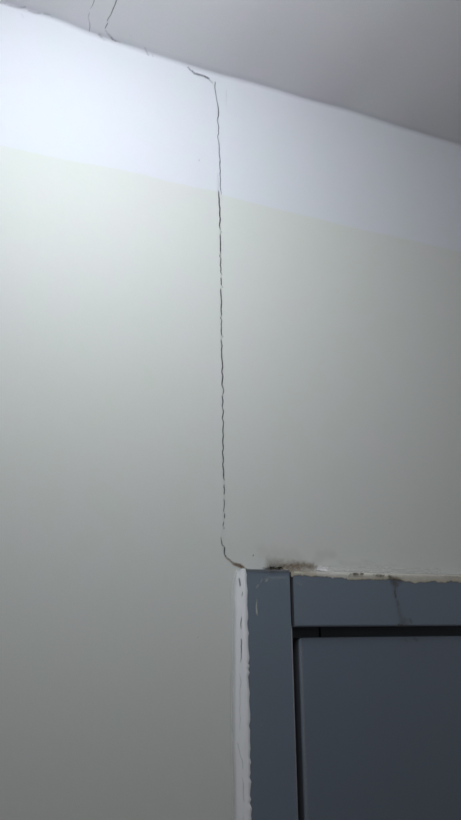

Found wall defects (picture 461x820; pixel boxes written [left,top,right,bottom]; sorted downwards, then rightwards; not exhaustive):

crack [192,71,243,594]